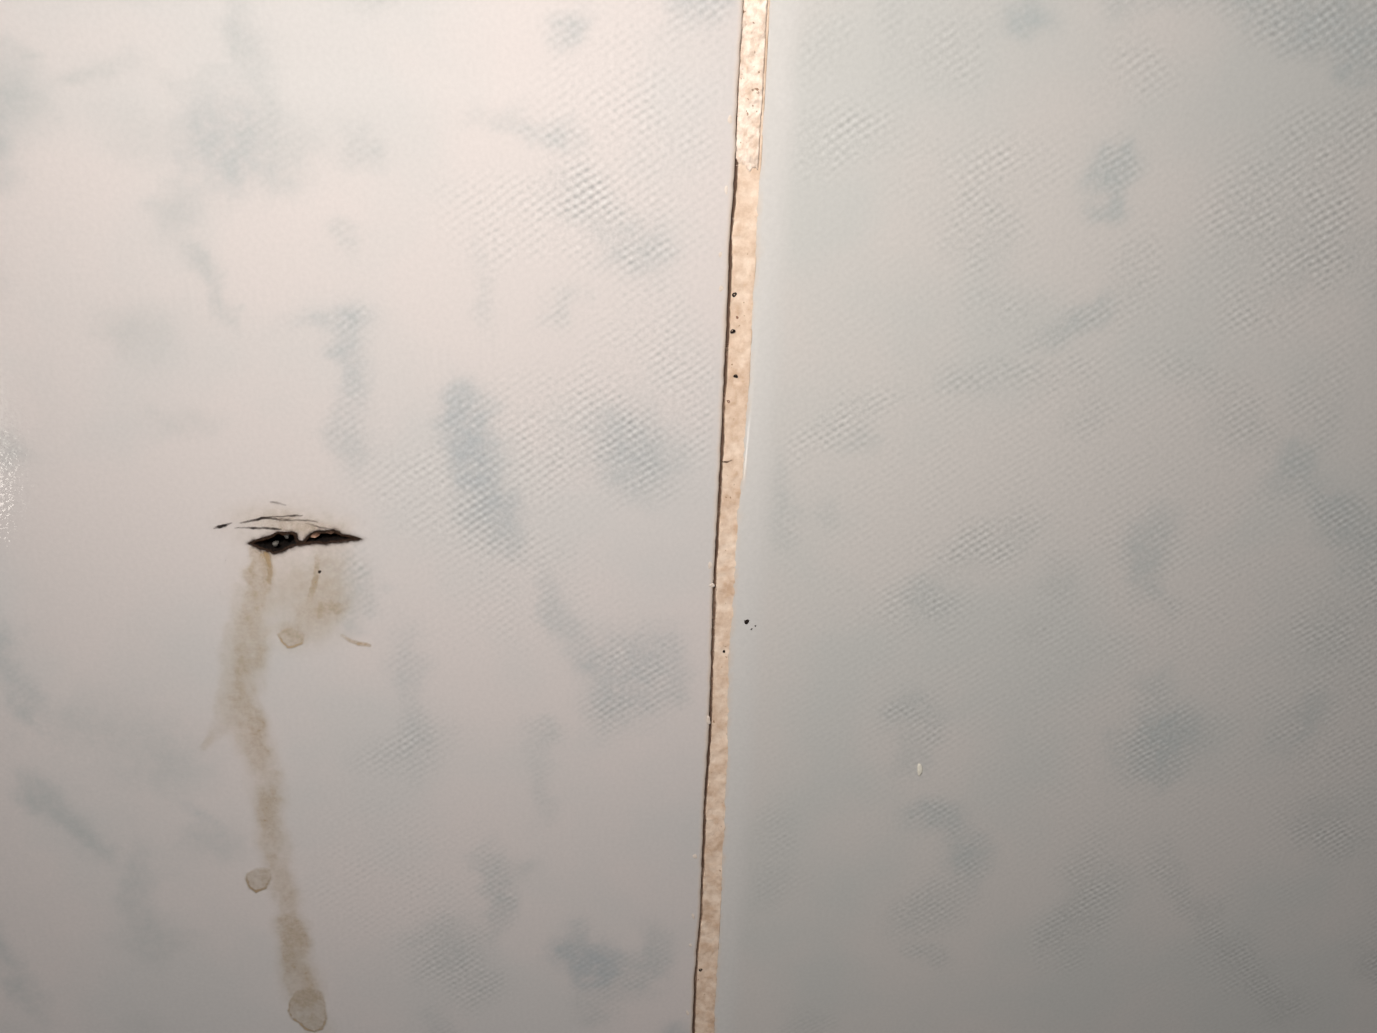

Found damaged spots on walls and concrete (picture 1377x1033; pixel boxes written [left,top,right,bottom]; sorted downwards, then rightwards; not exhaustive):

spalling [252,530,355,553]